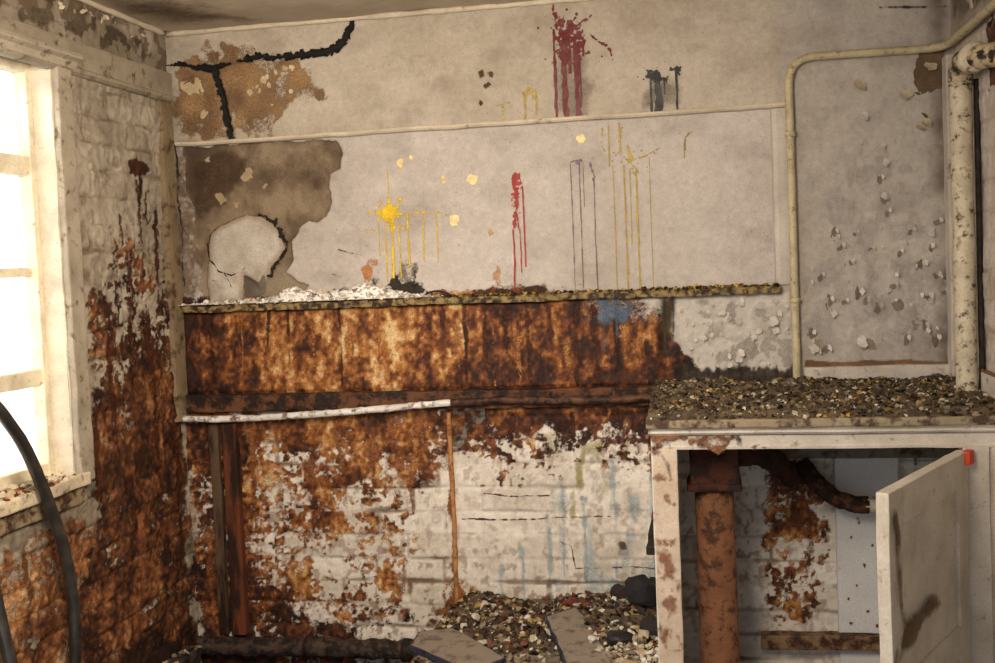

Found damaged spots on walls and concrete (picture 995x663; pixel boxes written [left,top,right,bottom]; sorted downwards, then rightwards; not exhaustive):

peeling [18,0,151,61]
crack [167,21,355,139]
peeling [899,49,946,99]
spalling [986,15,995,43]
spalling [183,139,343,306]
rust [63,169,741,663]
rust [0,529,69,663]
rust [761,471,831,631]